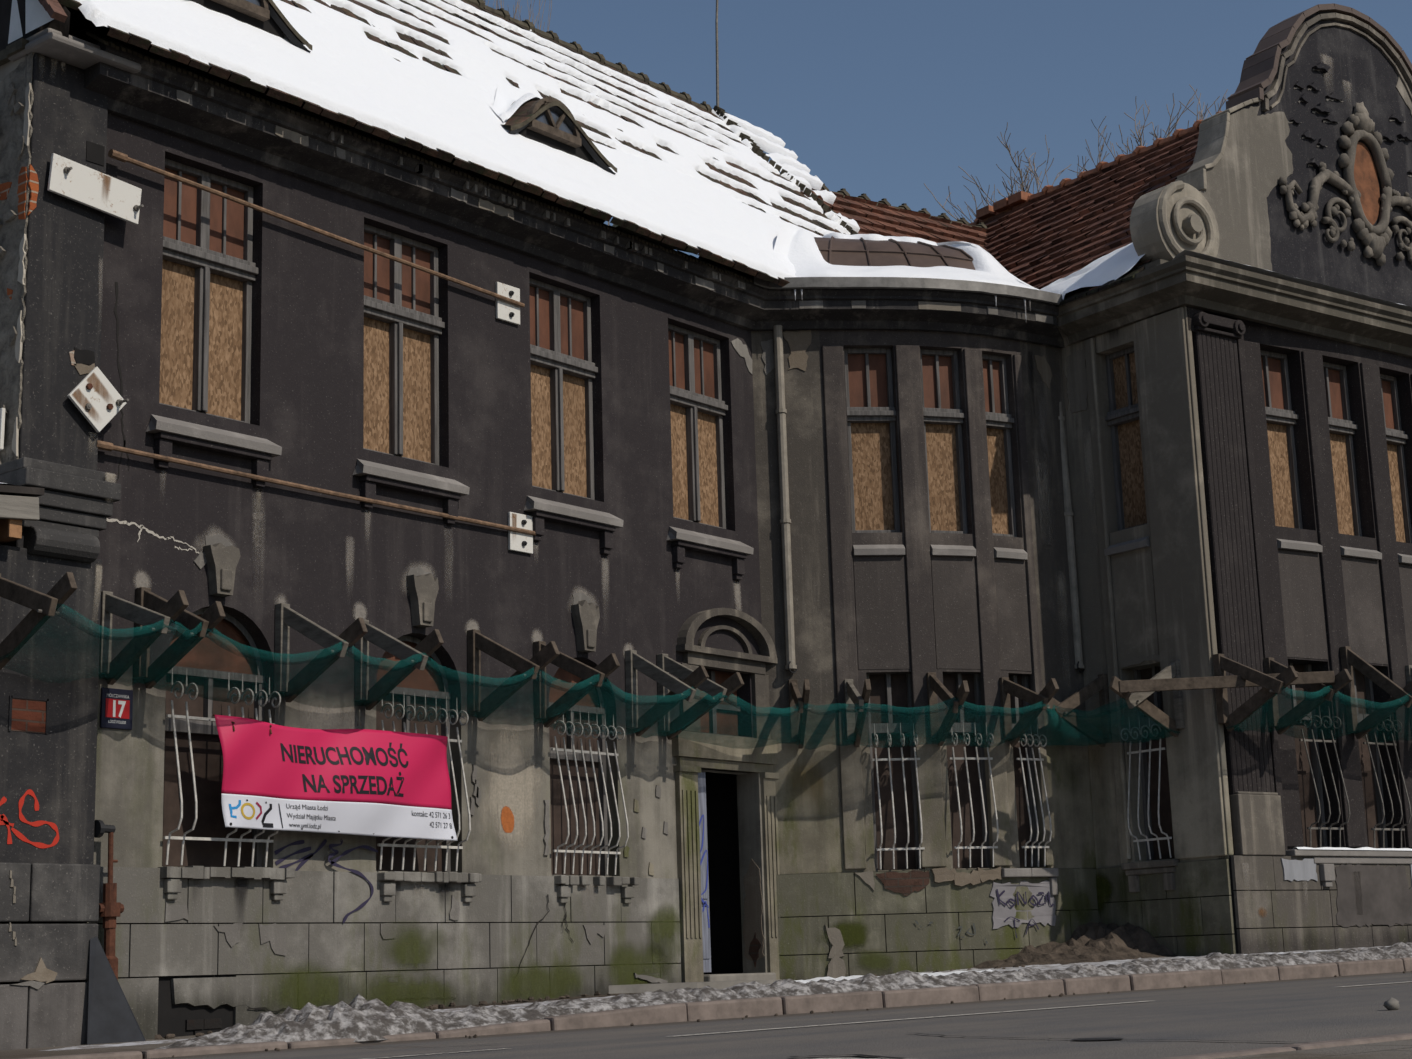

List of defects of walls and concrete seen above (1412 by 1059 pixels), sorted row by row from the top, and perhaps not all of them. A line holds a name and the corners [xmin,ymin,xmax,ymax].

spalling [0,52,39,464]
flaking render [1395,76,1412,116]